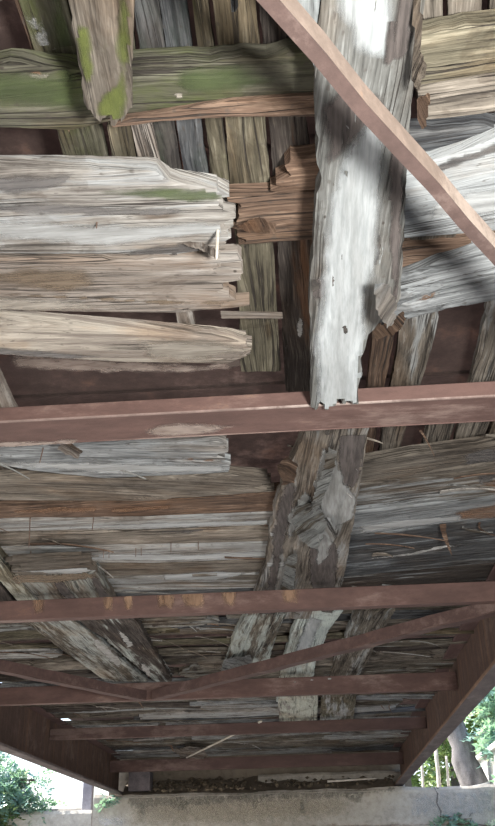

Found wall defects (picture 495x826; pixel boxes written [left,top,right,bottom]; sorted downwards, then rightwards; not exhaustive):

corrosion [159,594,203,608]